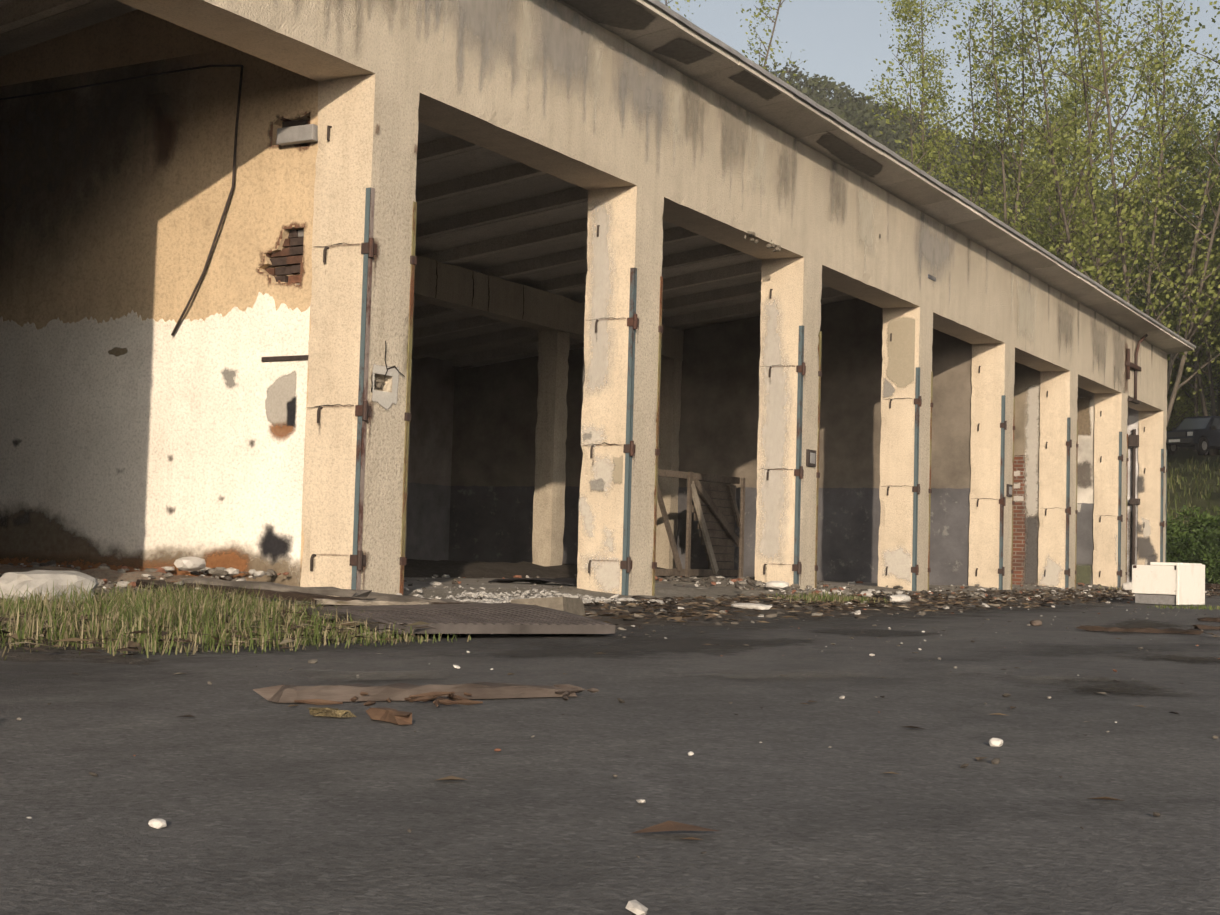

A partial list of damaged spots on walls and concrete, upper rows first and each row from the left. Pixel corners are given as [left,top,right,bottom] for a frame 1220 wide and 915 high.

water stain [540,0,655,77]
water stain [619,38,713,137]
water stain [729,70,781,101]
spalling [268,111,311,151]
water stain [720,103,745,160]
water stain [817,132,882,207]
water stain [1048,287,1125,389]
peeling [0,222,310,567]
water stain [259,526,291,562]